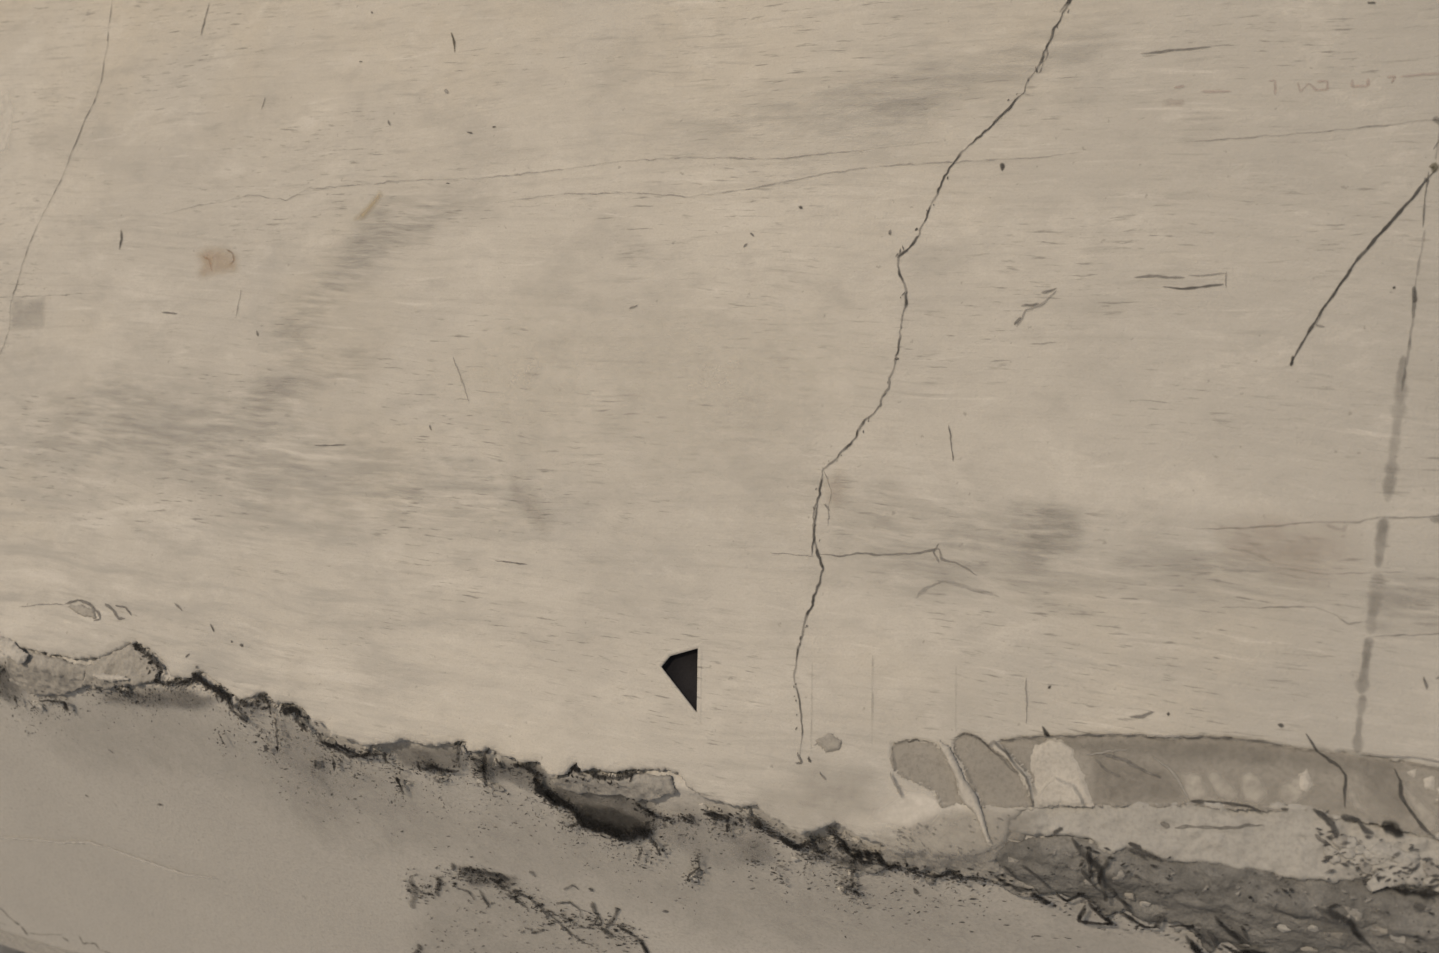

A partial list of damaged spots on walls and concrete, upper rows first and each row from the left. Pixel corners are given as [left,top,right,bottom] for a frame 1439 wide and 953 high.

crack [895,0,1071,360]
crack [1290,140,1439,365]
crack [773,394,966,735]
spalling [0,636,1439,953]